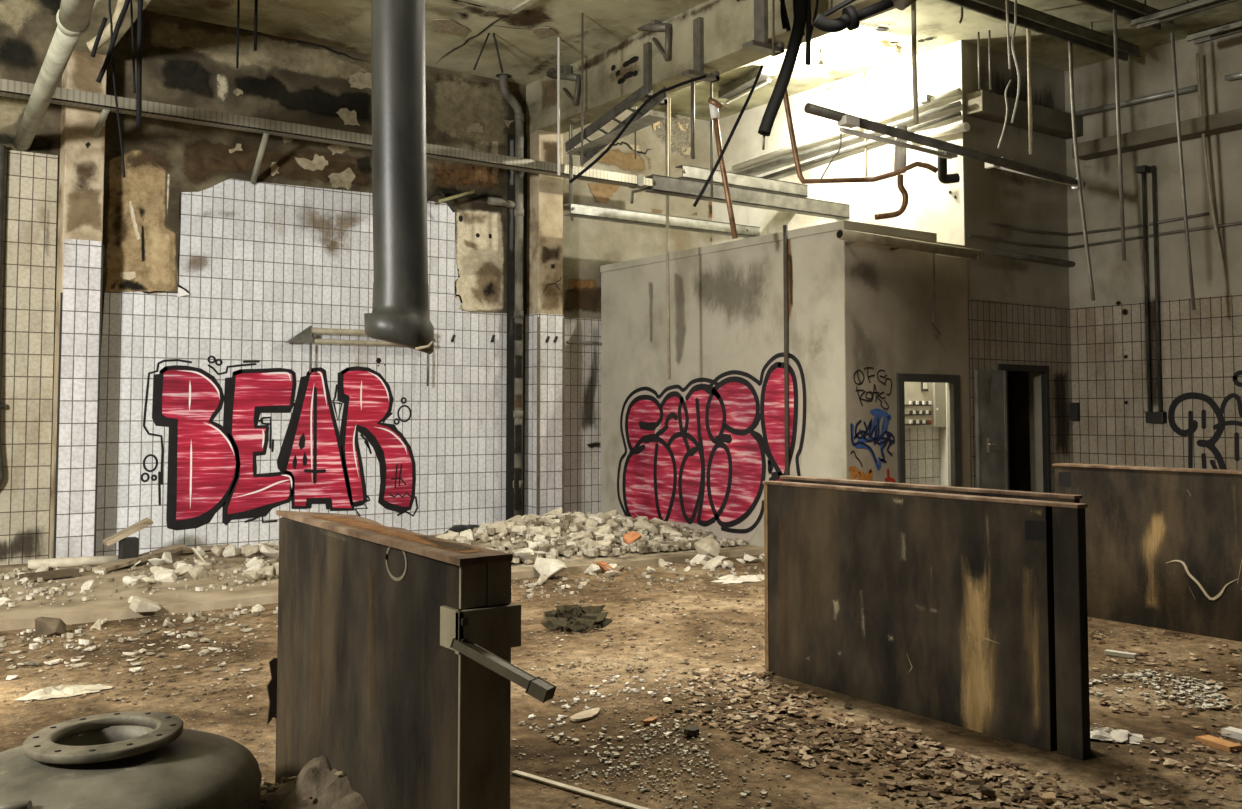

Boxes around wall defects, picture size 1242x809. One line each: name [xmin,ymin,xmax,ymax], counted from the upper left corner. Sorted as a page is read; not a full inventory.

peeling [0,96,29,128]
peeling [105,137,371,297]
peeling [454,210,504,311]
damp [675,275,685,362]
damp [699,275,757,315]